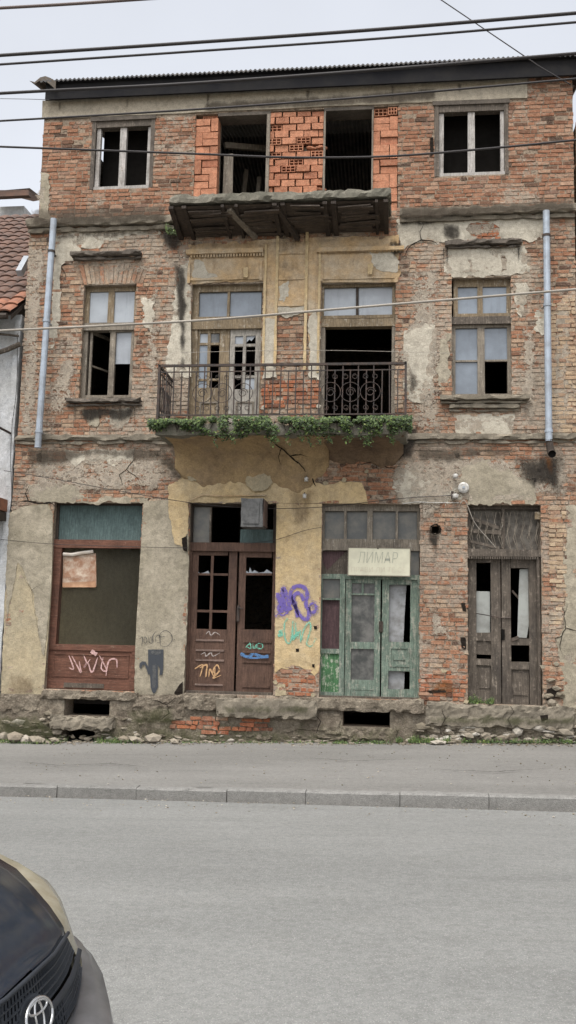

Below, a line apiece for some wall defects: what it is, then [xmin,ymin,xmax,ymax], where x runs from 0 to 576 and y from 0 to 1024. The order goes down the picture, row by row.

flaking render [395,213,543,278]
damp [175,266,187,368]
damp [399,248,568,518]
crack [273,442,316,486]
damp [428,608,454,639]
spalling [273,664,316,697]
spalling [418,669,469,703]
spalling [170,716,273,735]